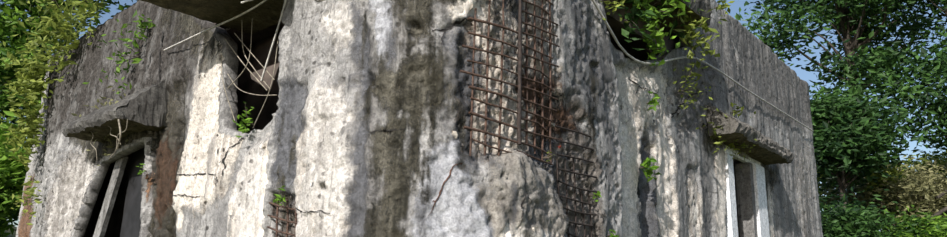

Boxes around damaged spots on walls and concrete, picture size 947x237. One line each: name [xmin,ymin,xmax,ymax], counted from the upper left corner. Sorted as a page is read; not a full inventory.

corrosion [145,137,178,228]
crack [172,137,244,197]
flaking render [172,35,298,237]
water stain [344,0,484,237]
crack [428,163,462,216]
spalling [412,0,604,237]
corrosion [515,74,576,141]